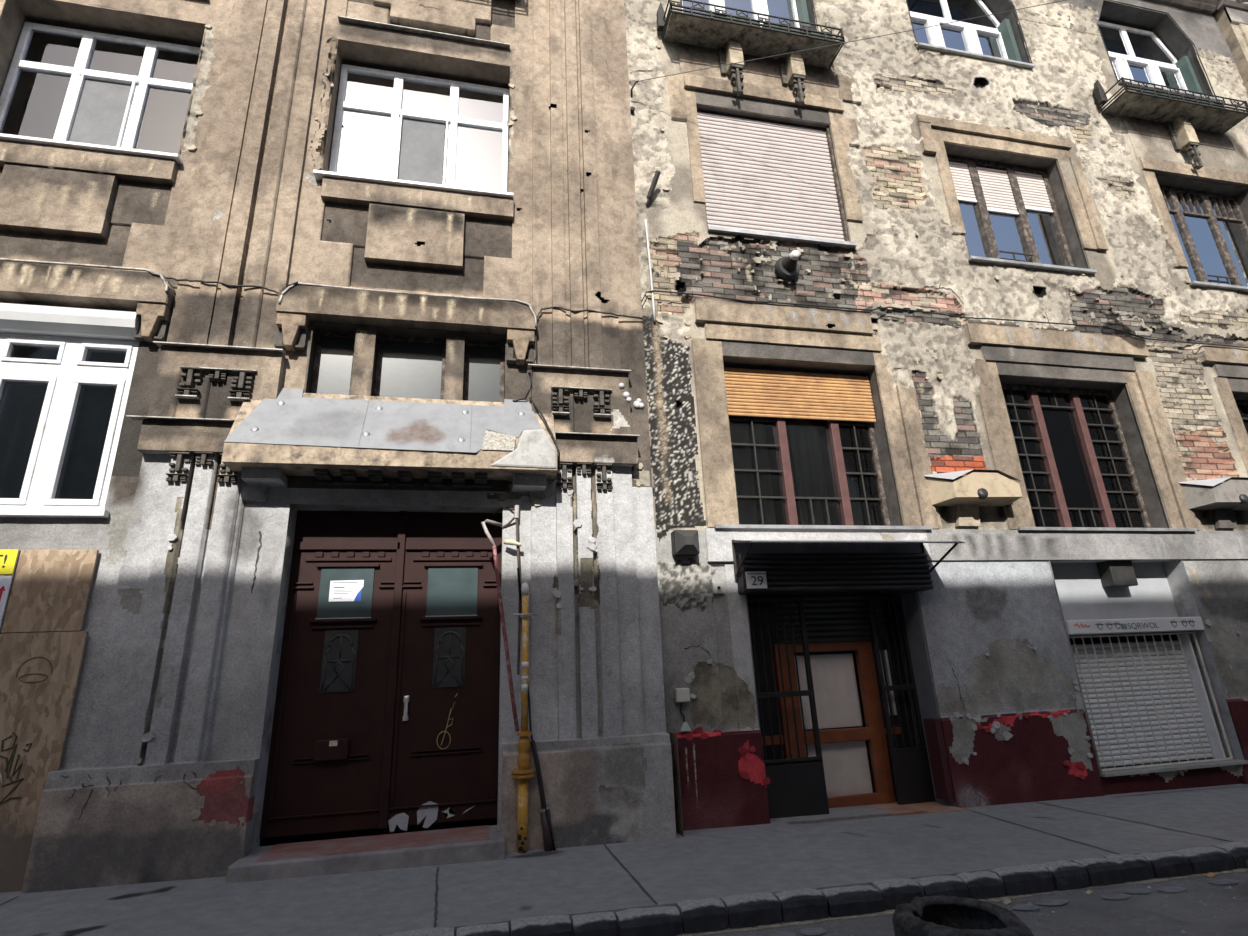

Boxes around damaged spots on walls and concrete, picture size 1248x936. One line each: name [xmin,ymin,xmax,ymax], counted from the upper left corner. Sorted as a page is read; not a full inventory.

flaking render [624,0,1248,480]
crack [251,531,262,594]
peeling [675,658,771,787]
peeling [935,636,1093,779]
peeling [189,766,259,827]